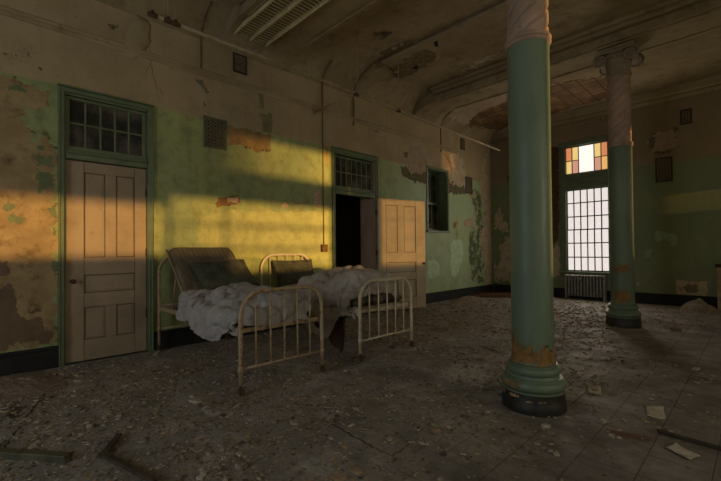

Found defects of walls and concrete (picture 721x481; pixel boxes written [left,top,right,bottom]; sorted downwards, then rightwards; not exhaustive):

flaking render [370,40,439,80]
flaking render [227,93,273,153]
flaking render [447,94,508,129]
peeling [401,166,427,184]
flaking render [446,153,466,195]
peeling [0,74,59,342]
flaking render [215,195,241,208]
water stain [468,189,484,284]